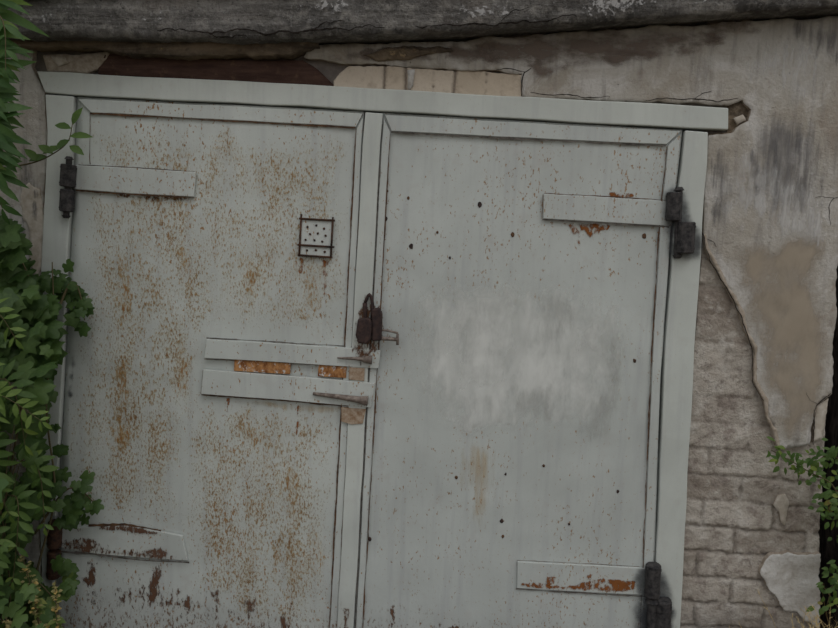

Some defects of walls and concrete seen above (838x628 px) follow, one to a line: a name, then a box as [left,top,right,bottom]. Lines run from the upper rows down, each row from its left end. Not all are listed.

crack [157,20,384,38]
crack [416,7,577,29]
corrosion [70,130,345,508]
corrosion [569,224,610,244]
leakage [740,125,824,430]
corrosion [61,405,326,628]
corrosion [521,574,635,592]
spalling [680,234,828,628]